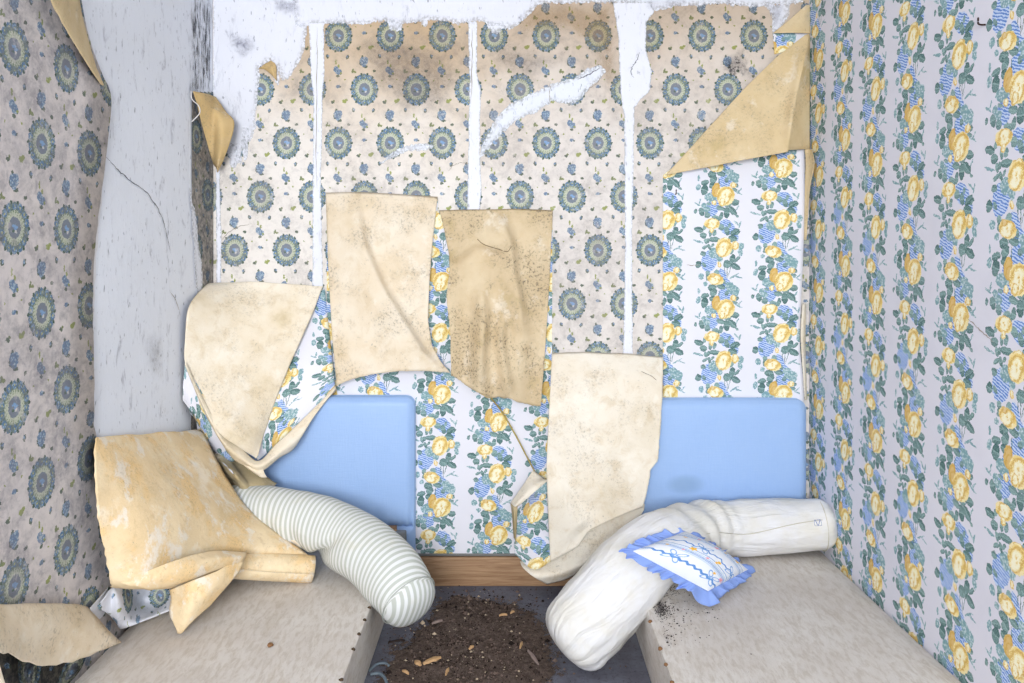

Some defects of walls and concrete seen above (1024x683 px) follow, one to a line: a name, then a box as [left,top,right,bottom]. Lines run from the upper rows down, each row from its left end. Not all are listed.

crack [106,157,171,253]
flaking render [193,0,803,354]